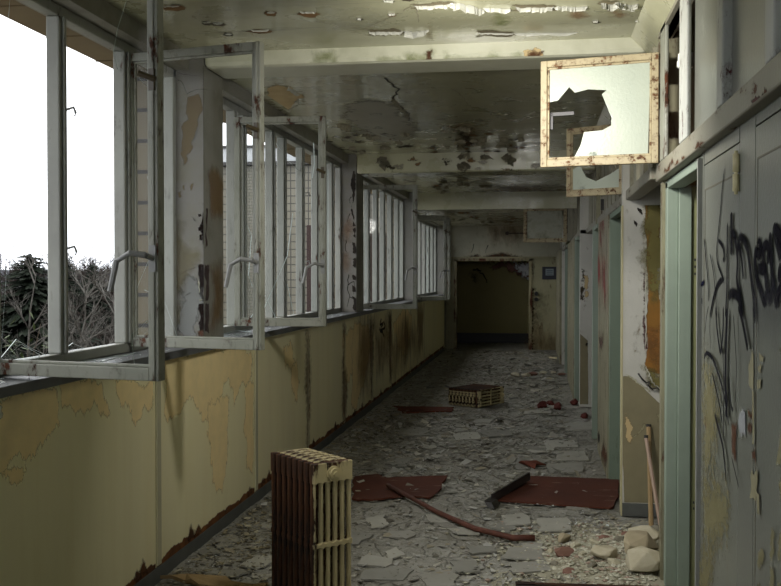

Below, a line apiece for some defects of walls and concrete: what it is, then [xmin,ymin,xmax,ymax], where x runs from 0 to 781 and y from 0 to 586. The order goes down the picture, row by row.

peeling [368,28,429,39]
peeling [383,0,588,16]
peeling [181,94,203,165]
crack [384,78,433,124]
peeling [0,388,60,485]
peeling [164,349,254,494]
peeling [623,205,661,503]
peeling [748,351,765,445]
rust [126,471,271,586]